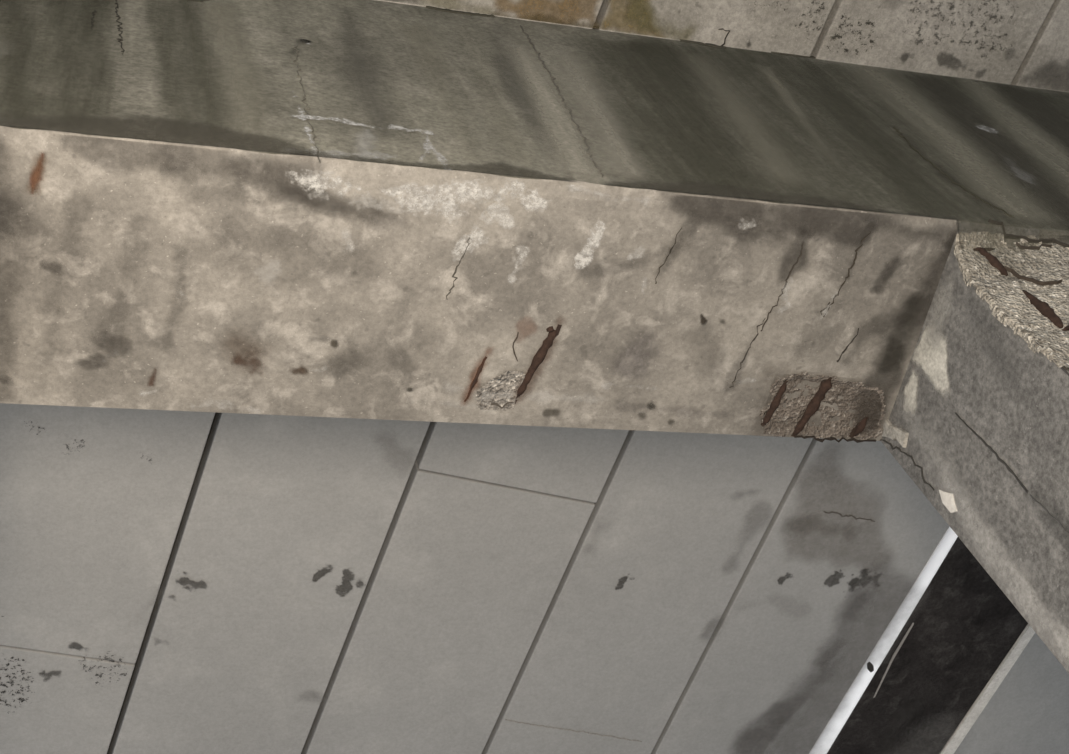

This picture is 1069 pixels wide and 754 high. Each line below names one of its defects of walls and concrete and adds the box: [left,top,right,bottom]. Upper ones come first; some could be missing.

water stain [0,0,373,158]
water stain [352,47,590,227]
water stain [497,0,1069,279]
spalling [464,324,562,411]
crack [655,228,682,284]
crack [729,242,804,388]
crack [820,231,871,317]
crack [837,328,859,362]
water stain [858,230,955,432]
peeling [904,287,950,413]
spalling [954,219,1069,368]
spalling [760,372,958,513]